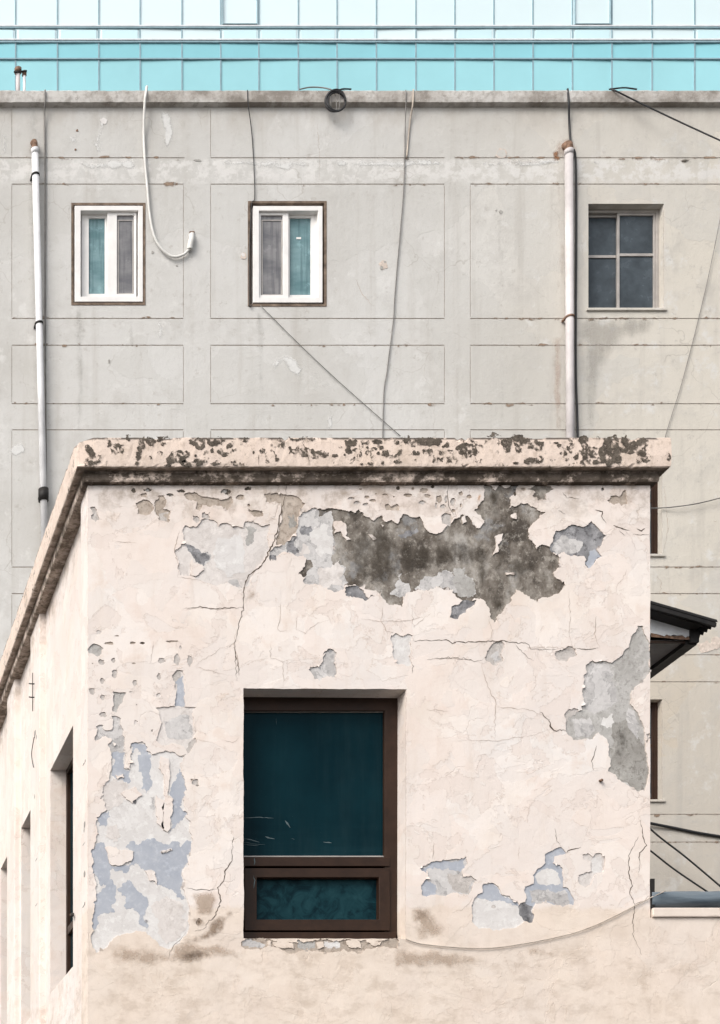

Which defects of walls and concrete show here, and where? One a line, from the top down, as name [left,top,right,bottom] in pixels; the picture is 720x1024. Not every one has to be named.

crack [174,486,287,677]
spalling [131,485,606,622]
damp [355,531,479,578]
peeling [555,647,576,662]
spalling [564,626,651,792]
peeling [82,630,202,953]
damp [175,945,221,961]
damp [197,894,214,924]
spalling [241,938,399,954]
peeling [420,847,605,931]
crack [628,821,648,953]